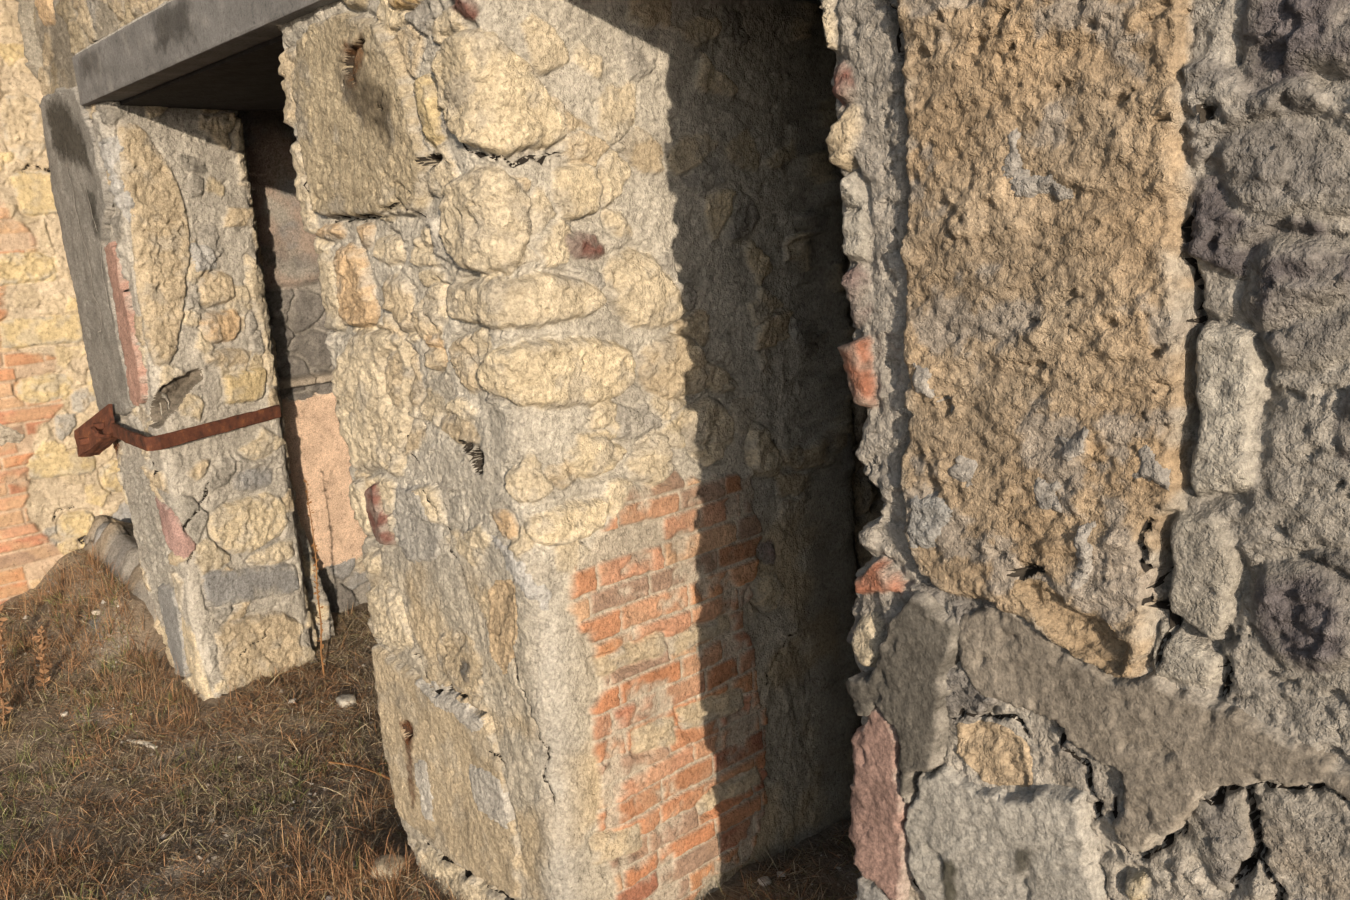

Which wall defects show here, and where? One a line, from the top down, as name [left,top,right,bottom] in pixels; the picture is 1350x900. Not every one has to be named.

crack [426,841,514,900]
crack [947,709,1347,900]